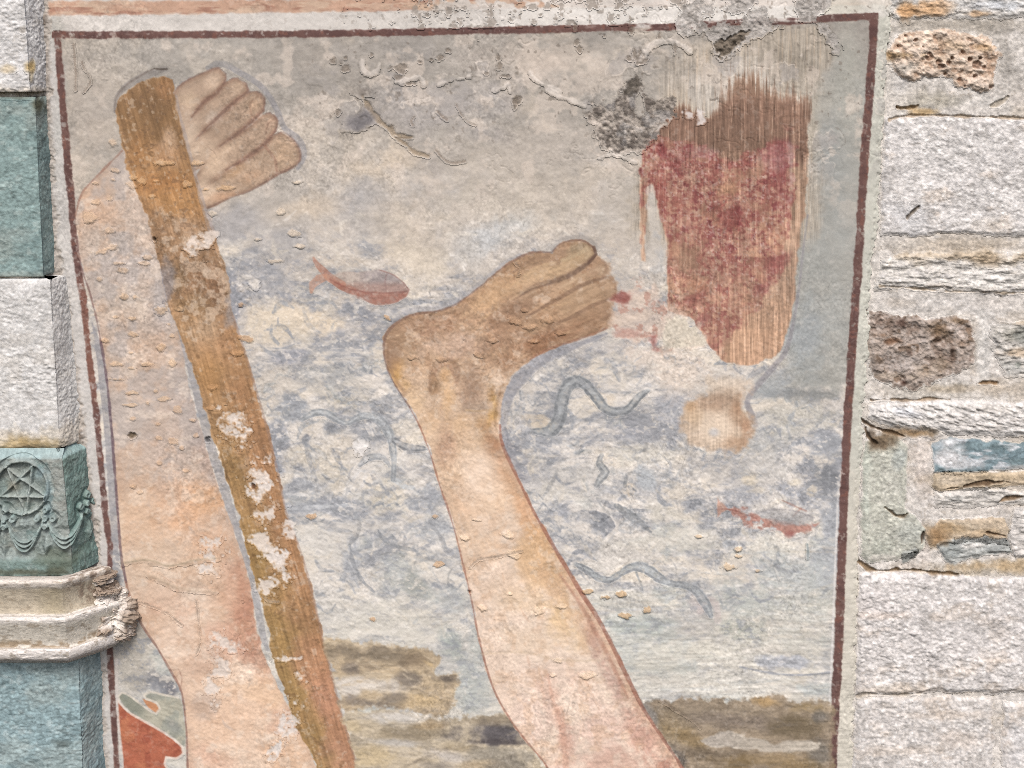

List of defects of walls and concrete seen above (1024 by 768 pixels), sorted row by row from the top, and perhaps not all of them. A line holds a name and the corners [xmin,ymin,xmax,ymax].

flaking render [329,0,785,164]
flaking render [793,0,845,56]
peeling [181,210,220,262]
peeling [108,300,318,603]